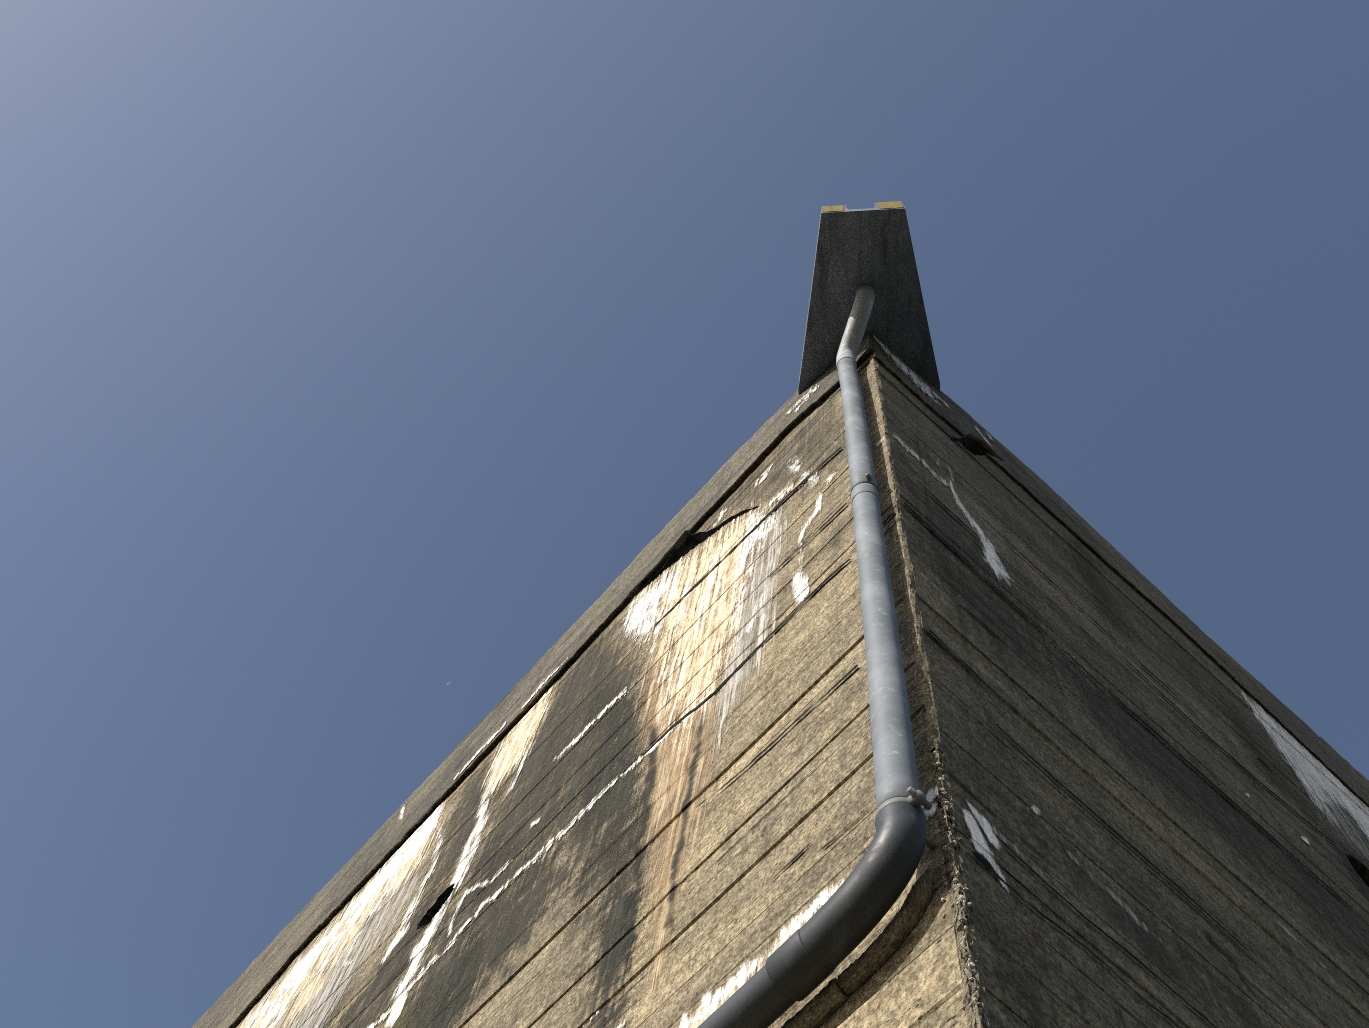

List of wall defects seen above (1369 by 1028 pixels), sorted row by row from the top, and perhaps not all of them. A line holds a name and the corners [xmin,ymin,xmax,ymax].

spalling [632,506,760,599]
damp [713,412,834,550]
damp [793,567,810,603]
damp [877,436,1048,652]
spalling [951,436,993,456]
damp [237,623,709,1028]
damp [963,801,1018,890]
damp [1086,688,1369,959]
damp [679,881,843,1028]